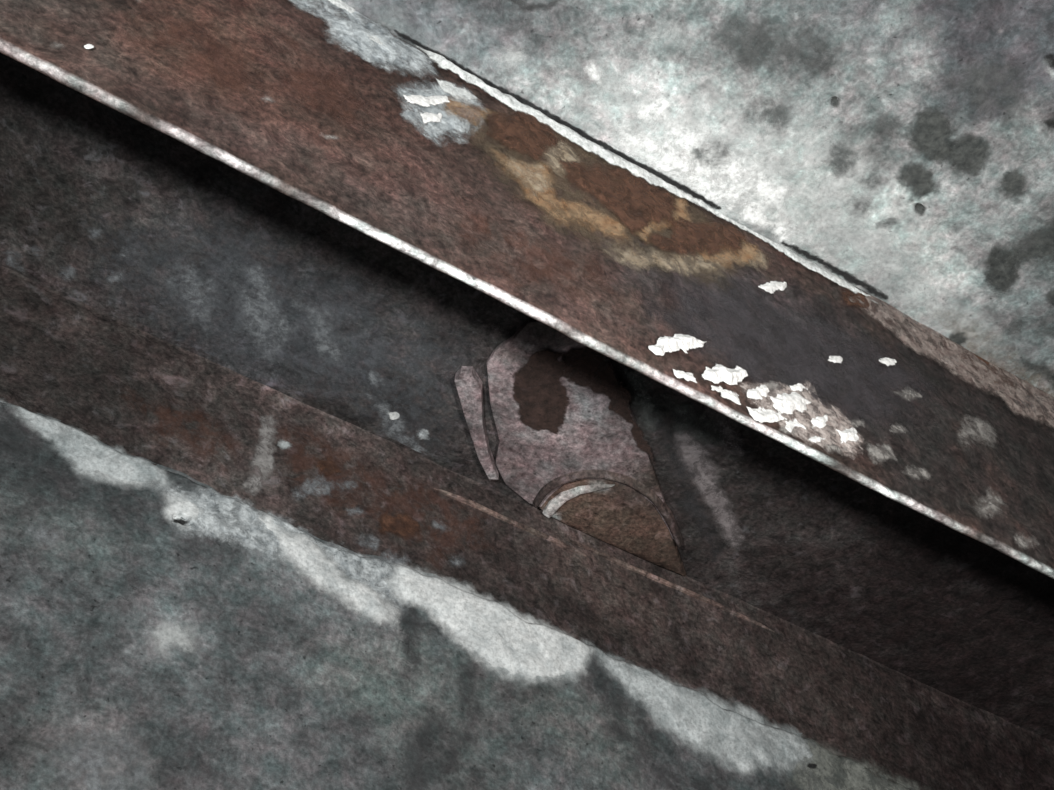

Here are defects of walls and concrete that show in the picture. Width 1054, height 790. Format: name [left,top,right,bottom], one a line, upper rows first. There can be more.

crack [511,0,558,10]
rust [446,99,764,272]
water stain [398,44,989,345]
water stain [1001,171,1025,200]
water stain [986,223,1054,293]
water stain [682,292,915,412]
water stain [1,401,918,790]